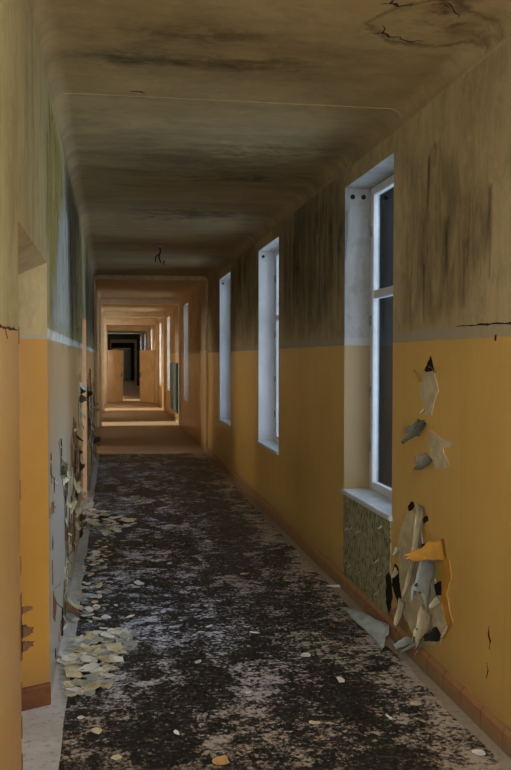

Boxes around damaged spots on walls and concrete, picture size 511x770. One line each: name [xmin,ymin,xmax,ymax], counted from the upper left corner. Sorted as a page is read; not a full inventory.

leakage [47,126,93,333]
crack [460,320,511,328]
peeling [401,356,457,470]
peeling [49,369,101,659]
peeling [343,494,454,655]